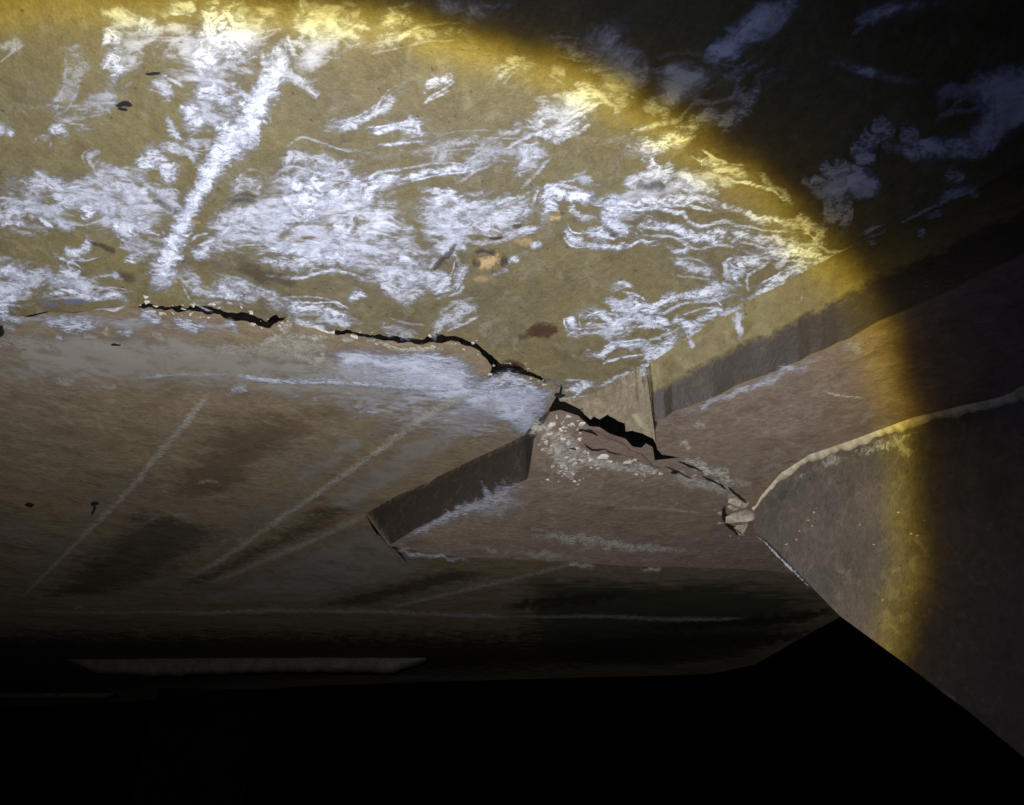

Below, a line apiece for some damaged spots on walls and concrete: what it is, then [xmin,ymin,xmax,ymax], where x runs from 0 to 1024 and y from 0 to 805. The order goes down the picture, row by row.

damp [0,0,1024,430]
crack [138,295,285,331]
crack [335,330,547,385]
crack [570,429,620,455]
spalling [538,394,679,489]
crack [666,461,746,535]
spalling [714,495,754,541]